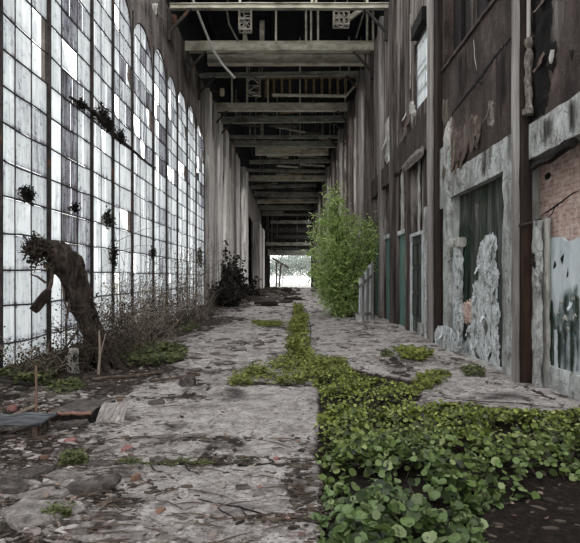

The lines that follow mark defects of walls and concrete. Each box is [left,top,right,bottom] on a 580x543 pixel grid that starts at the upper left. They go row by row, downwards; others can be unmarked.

peeling [441,99,495,178]
crack [541,189,580,218]
peeling [434,233,501,367]
water stain [549,287,579,372]